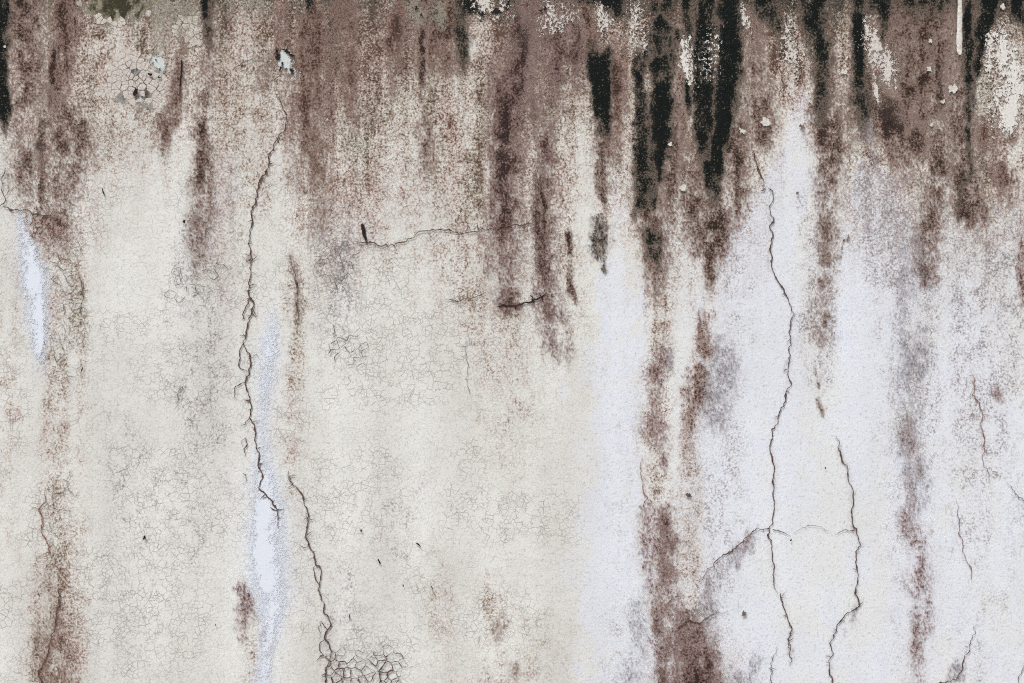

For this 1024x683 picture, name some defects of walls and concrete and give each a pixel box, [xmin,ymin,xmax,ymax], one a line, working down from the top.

damp [4,0,97,368]
peeling [76,0,174,112]
damp [152,0,220,274]
crack [164,76,405,683]
peeling [275,48,301,80]
damp [256,0,364,238]
crack [289,180,554,325]
damp [400,0,463,180]
damp [479,0,1024,683]
crack [696,150,864,683]
crack [675,610,726,633]